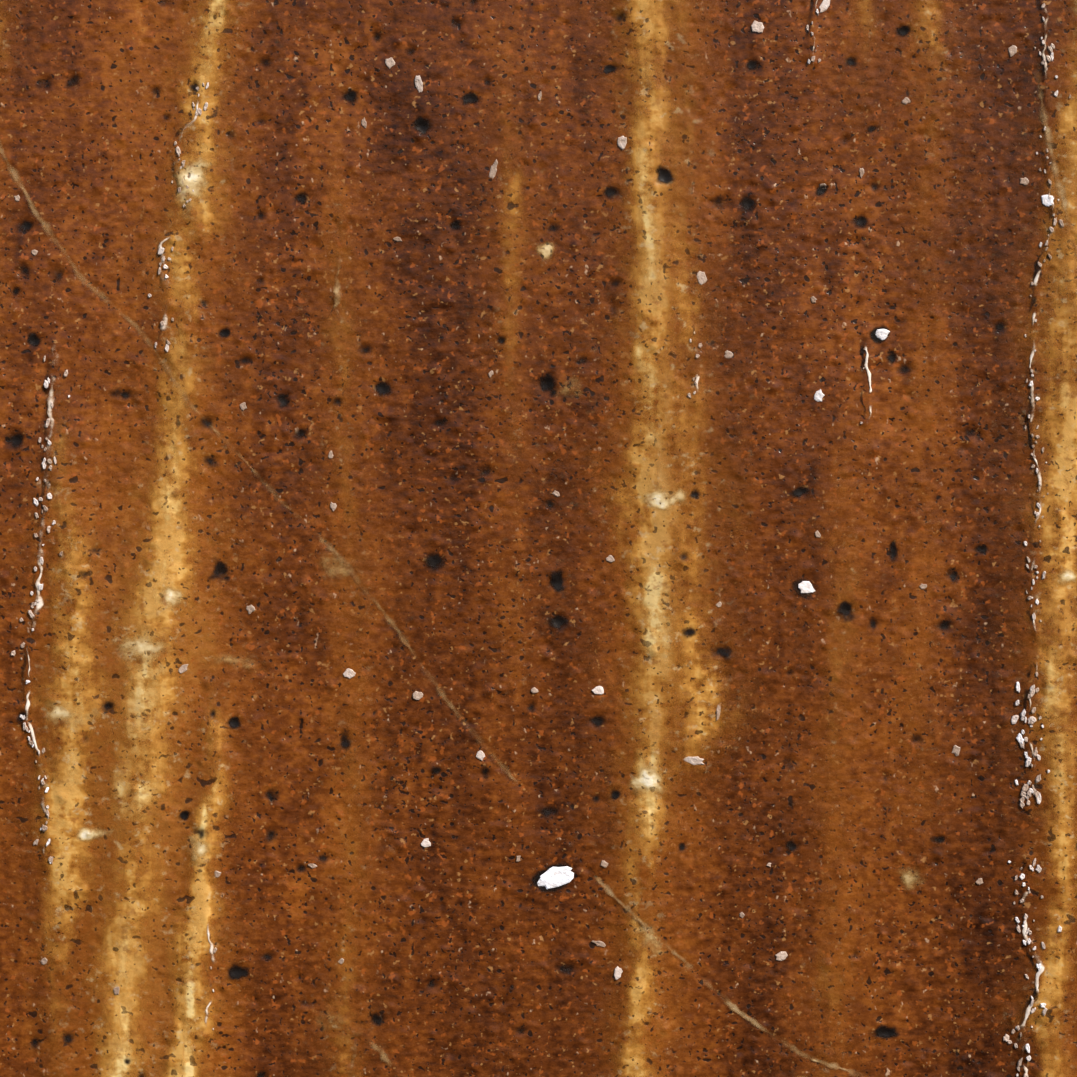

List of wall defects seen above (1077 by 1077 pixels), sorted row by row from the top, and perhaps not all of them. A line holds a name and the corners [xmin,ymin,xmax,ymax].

corrosion [32,0,237,1077]
corrosion [503,173,522,305]
corrosion [618,917,658,1077]
corrosion [609,0,739,902]
corrosion [912,0,945,53]
corrosion [1028,42,1077,1077]